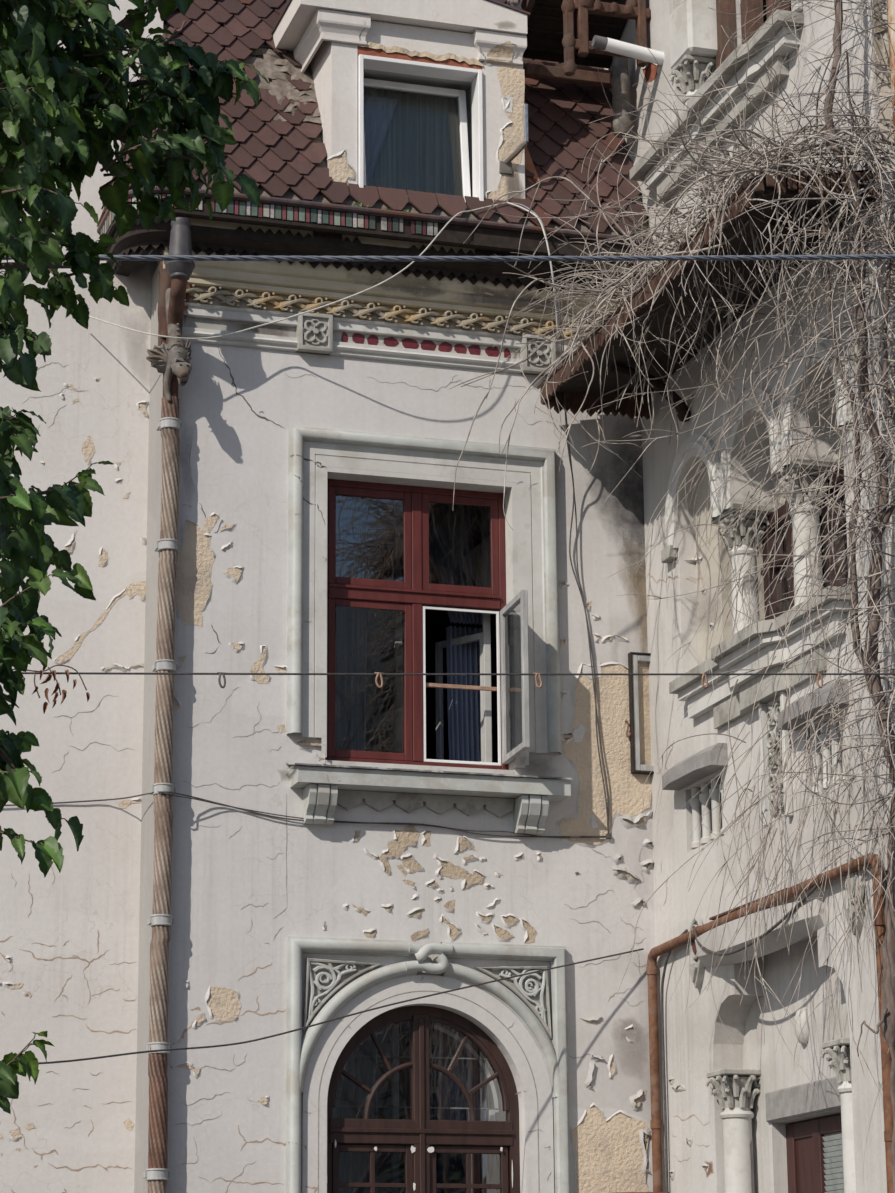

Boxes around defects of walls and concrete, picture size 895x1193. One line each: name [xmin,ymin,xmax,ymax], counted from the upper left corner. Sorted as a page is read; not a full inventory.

peeling [357,41,525,209]
crack [218,348,283,428]
damp [601,447,645,546]
peeling [53,581,146,665]
peeling [176,512,244,627]
peeling [555,660,654,884]
crack [0,866,136,1034]
crack [172,781,287,1045]
peeling [342,825,537,943]
crack [9,1071,131,1193]
crack [174,1054,318,1193]
peeling [570,1053,651,1193]